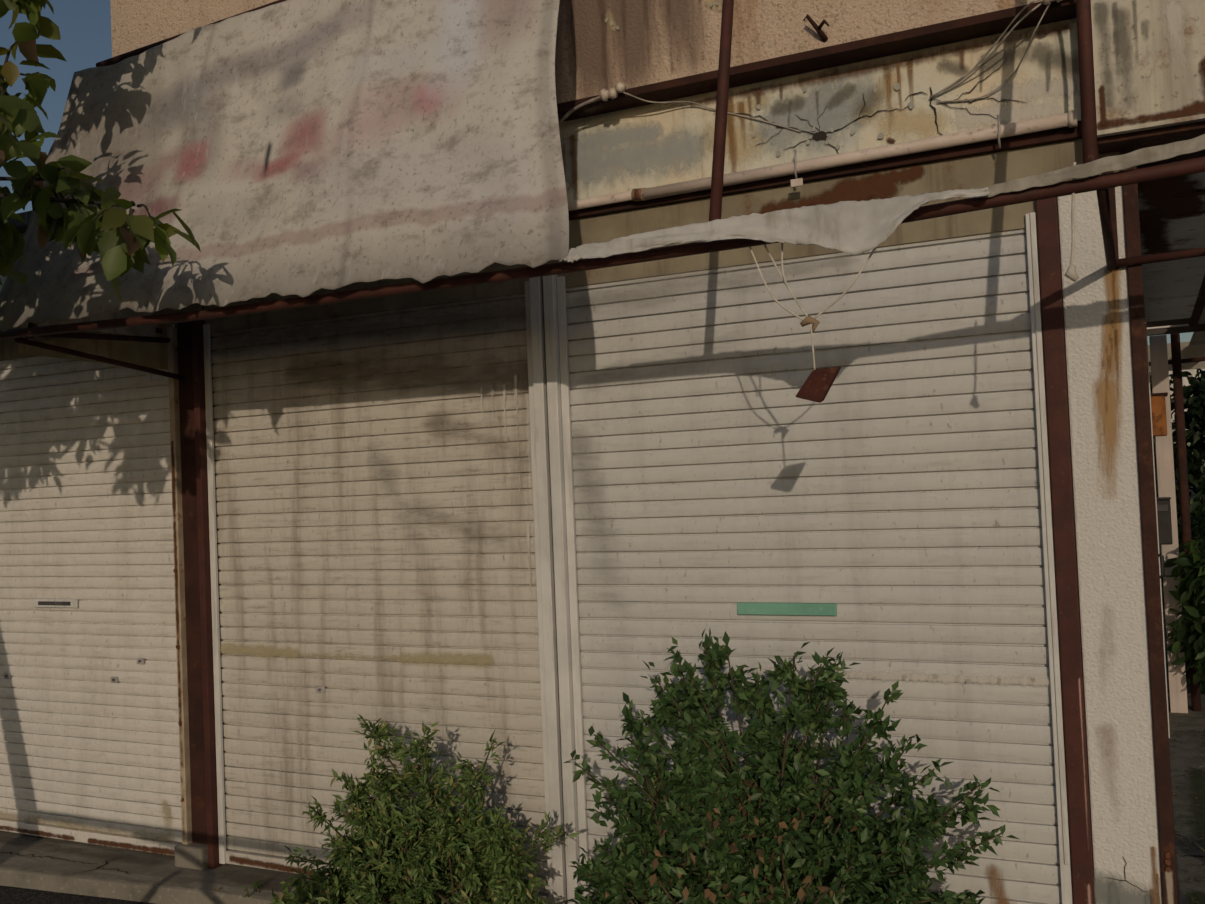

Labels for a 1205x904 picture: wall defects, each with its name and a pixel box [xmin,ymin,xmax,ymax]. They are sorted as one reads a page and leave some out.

crack [715,64,1027,152]
rust [1097,59,1205,130]
rust [563,135,577,190]
rust [758,164,923,214]
rust [1098,268,1121,474]
rust [990,868,1009,904]
rust [1150,847,1160,904]